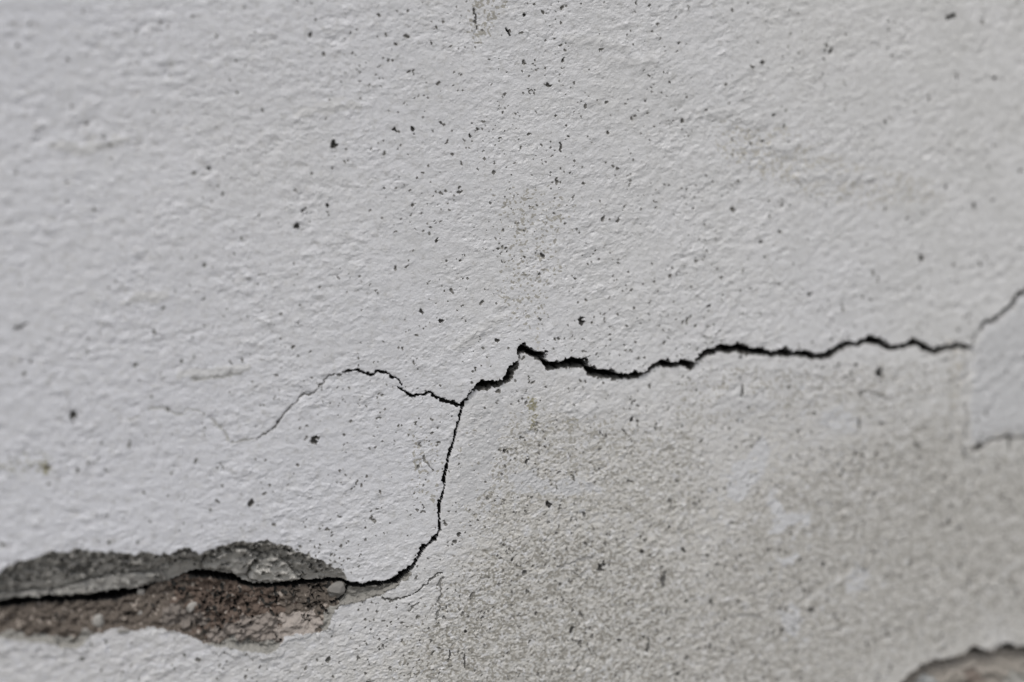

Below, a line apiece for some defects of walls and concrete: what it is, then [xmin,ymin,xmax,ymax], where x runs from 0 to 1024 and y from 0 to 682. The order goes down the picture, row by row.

spalling [0,540,412,655]
crack [128,290,1024,621]